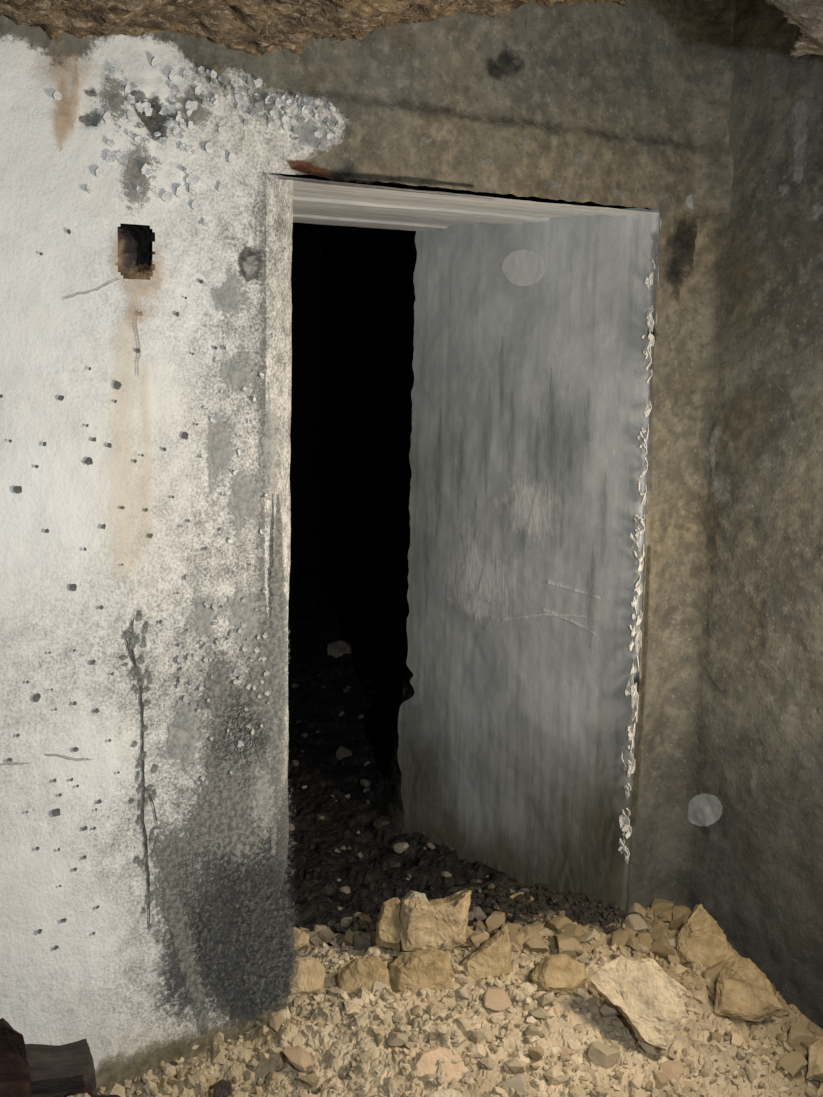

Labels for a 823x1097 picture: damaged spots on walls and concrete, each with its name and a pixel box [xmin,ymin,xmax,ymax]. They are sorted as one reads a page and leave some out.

damp [86,57,225,227]
rust [287,160,474,188]
spalling [618,232,658,864]
crack [120,610,159,929]
damp [95,494,299,1092]